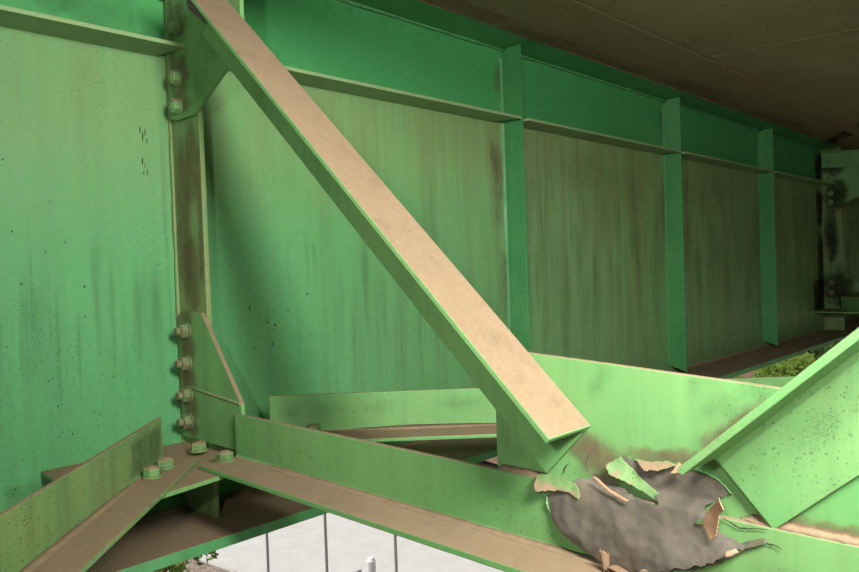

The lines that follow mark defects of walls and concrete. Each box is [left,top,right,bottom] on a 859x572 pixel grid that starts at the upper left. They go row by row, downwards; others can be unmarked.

water stain [814,237,824,310]
peeling [533,454,767,572]